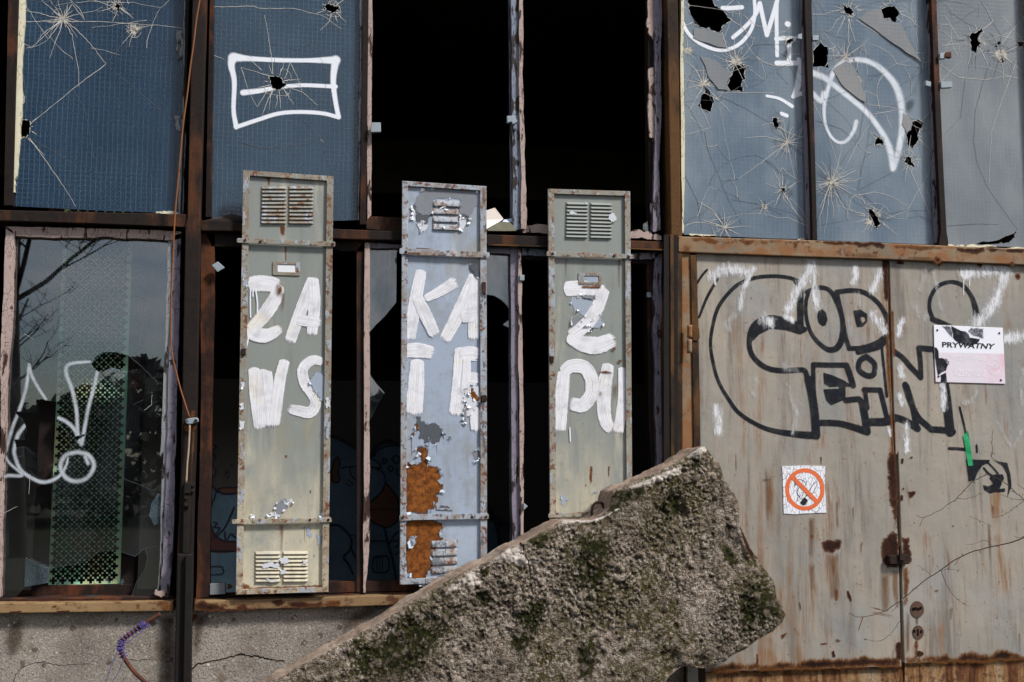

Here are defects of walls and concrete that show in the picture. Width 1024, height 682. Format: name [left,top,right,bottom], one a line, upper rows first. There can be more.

rust [957,247,1024,280]
peeling [571,293,606,332]
peeling [411,415,452,445]
rust [685,237,942,630]
peeling [250,498,295,519]
rust [406,437,448,587]
crack [192,653,284,669]
rust [710,618,1024,673]